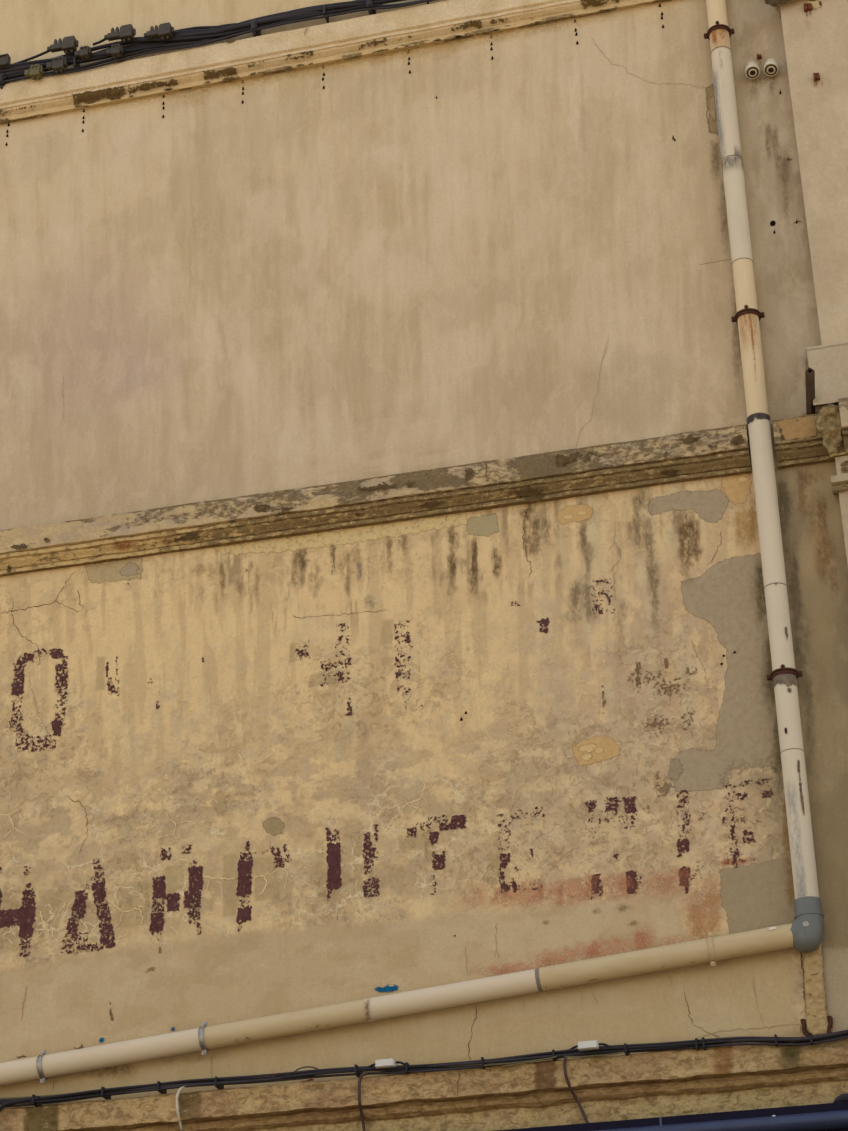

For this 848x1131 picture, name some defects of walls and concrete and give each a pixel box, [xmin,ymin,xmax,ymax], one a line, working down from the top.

crack [592,38,718,135]
crack [3,574,83,738]
crack [149,813,309,917]
crack [35,904,78,943]
crack [98,899,150,942]
crack [685,952,825,1038]